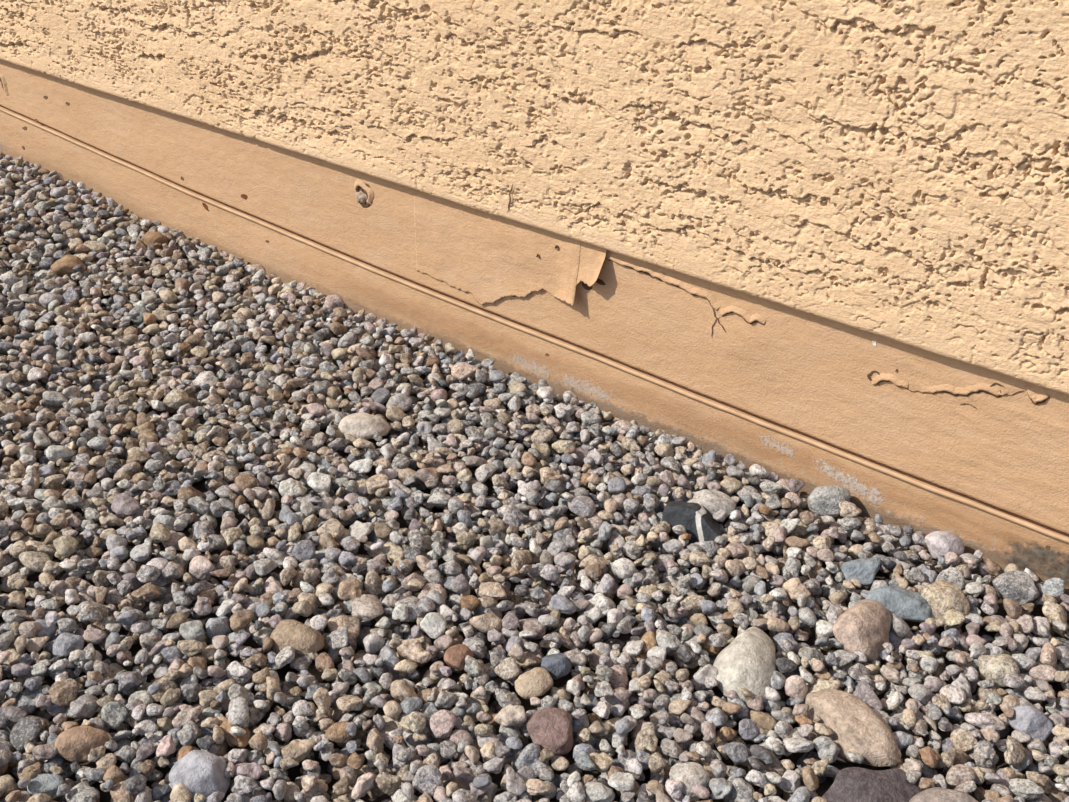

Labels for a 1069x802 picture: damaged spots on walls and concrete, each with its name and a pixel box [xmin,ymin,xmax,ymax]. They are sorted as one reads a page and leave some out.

peeling [414,189,607,307]
crack [605,252,766,337]
crack [867,371,1050,409]